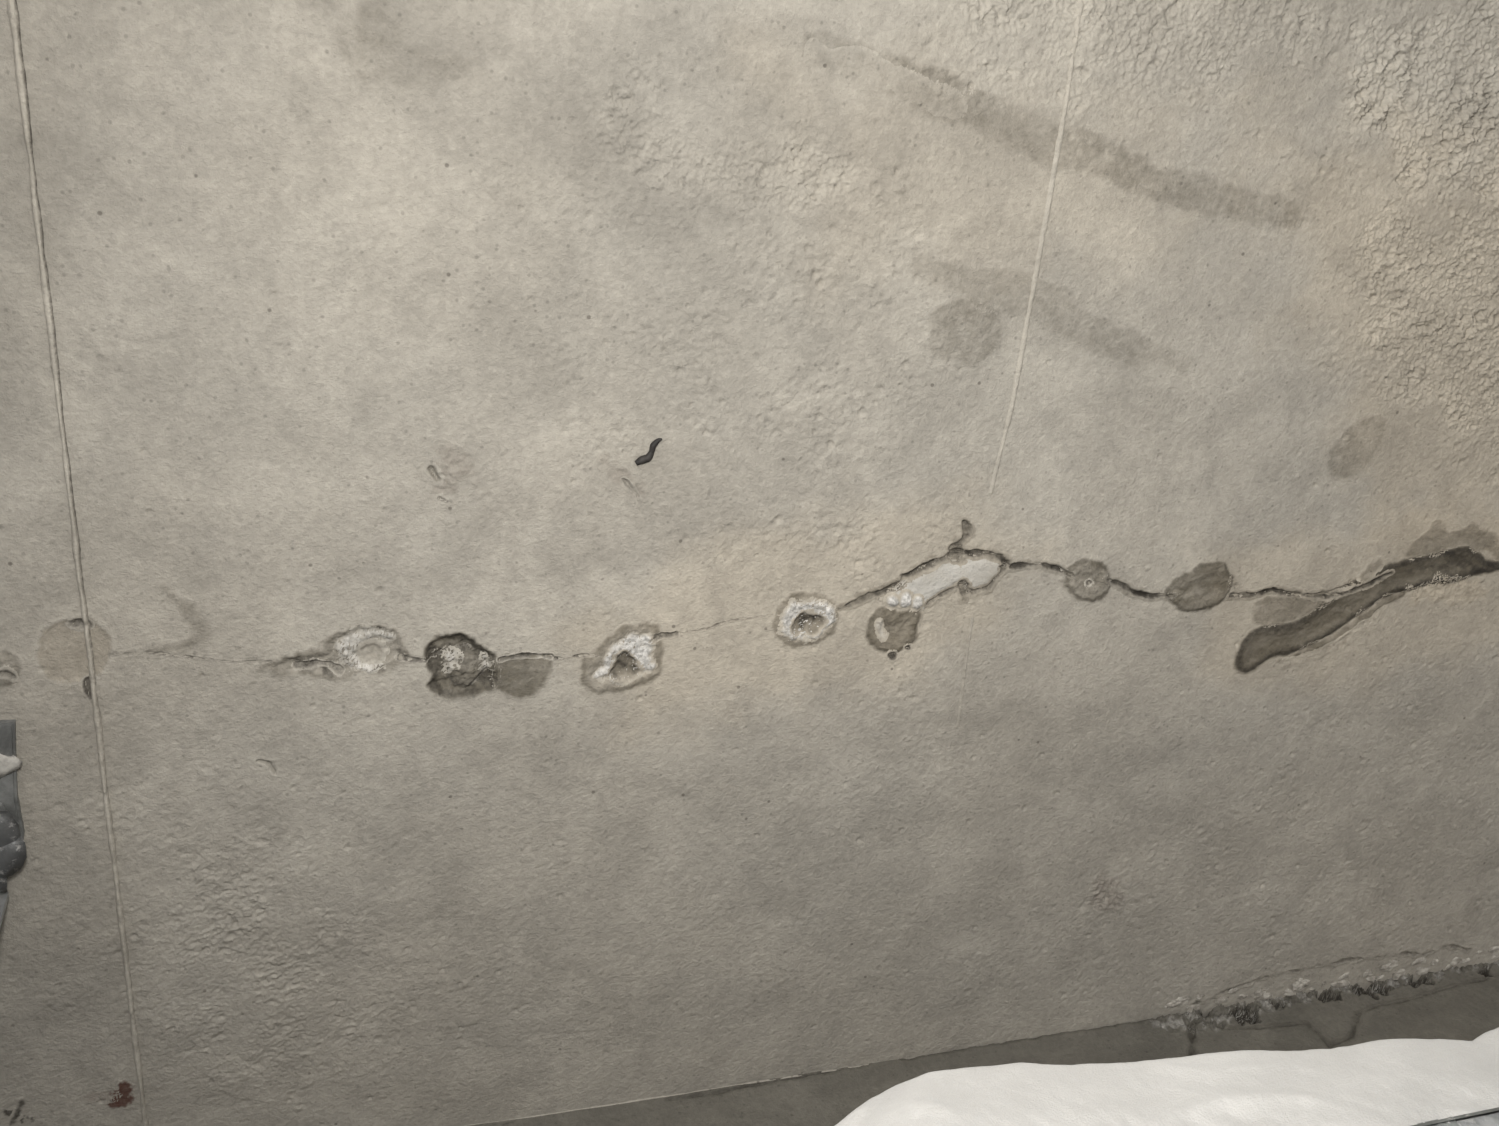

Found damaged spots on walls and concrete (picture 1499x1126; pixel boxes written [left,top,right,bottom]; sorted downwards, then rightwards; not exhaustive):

crack [831,514,1178,613]
damp [1058,555,1112,604]
crack [1225,569,1395,602]
damp [1160,517,1499,628]
crack [648,613,782,645]
damp [1275,591,1407,664]
crack [108,650,273,665]
spalling [255,623,502,703]
crack [394,645,450,665]
crack [544,652,599,661]
spalling [1146,942,1499,1036]